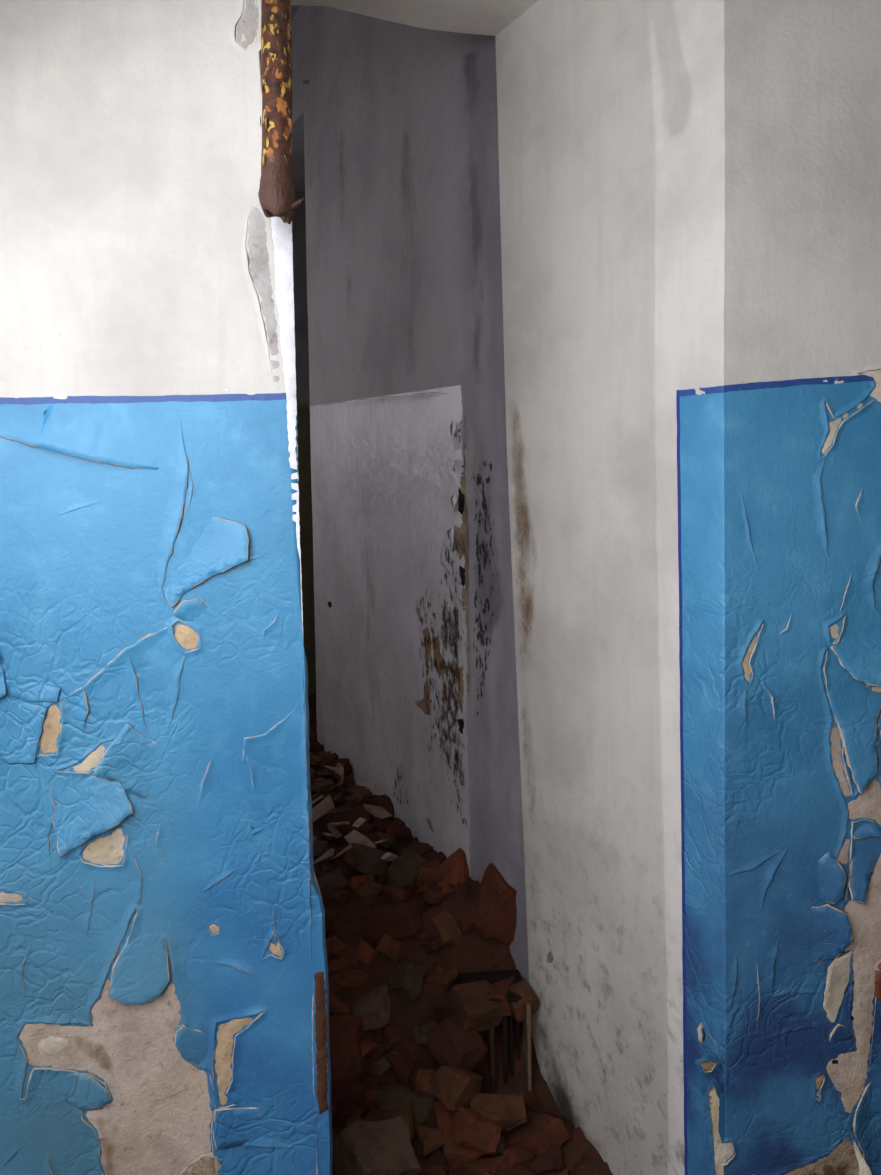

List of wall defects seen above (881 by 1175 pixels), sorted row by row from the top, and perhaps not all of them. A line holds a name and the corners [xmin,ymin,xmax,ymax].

flaking render [241,199,304,643]
peeling [816,362,881,462]
mould [416,462,493,815]
peeling [0,660,157,873]
peeling [0,885,29,909]
peeling [10,900,272,1175]
peeling [259,928,290,964]
peeling [695,1022,739,1175]
peeling [735,609,881,1175]